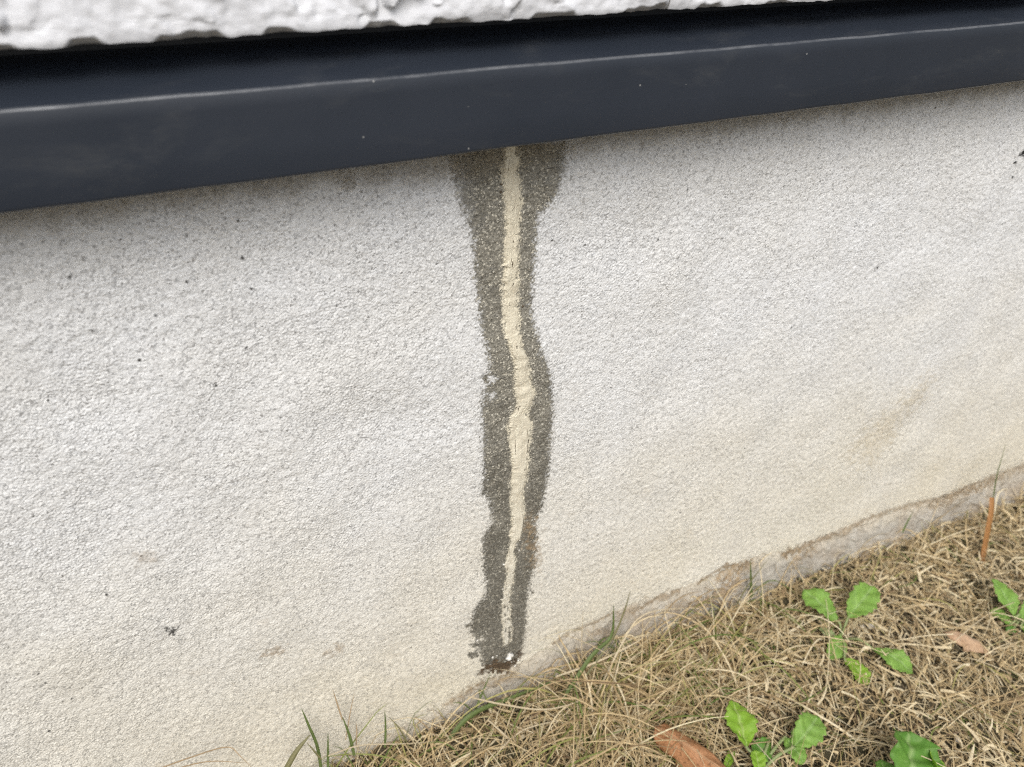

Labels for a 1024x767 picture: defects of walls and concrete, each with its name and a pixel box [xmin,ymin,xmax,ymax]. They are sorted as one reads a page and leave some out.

crack [476,146,537,667]
leakage [449,142,566,666]